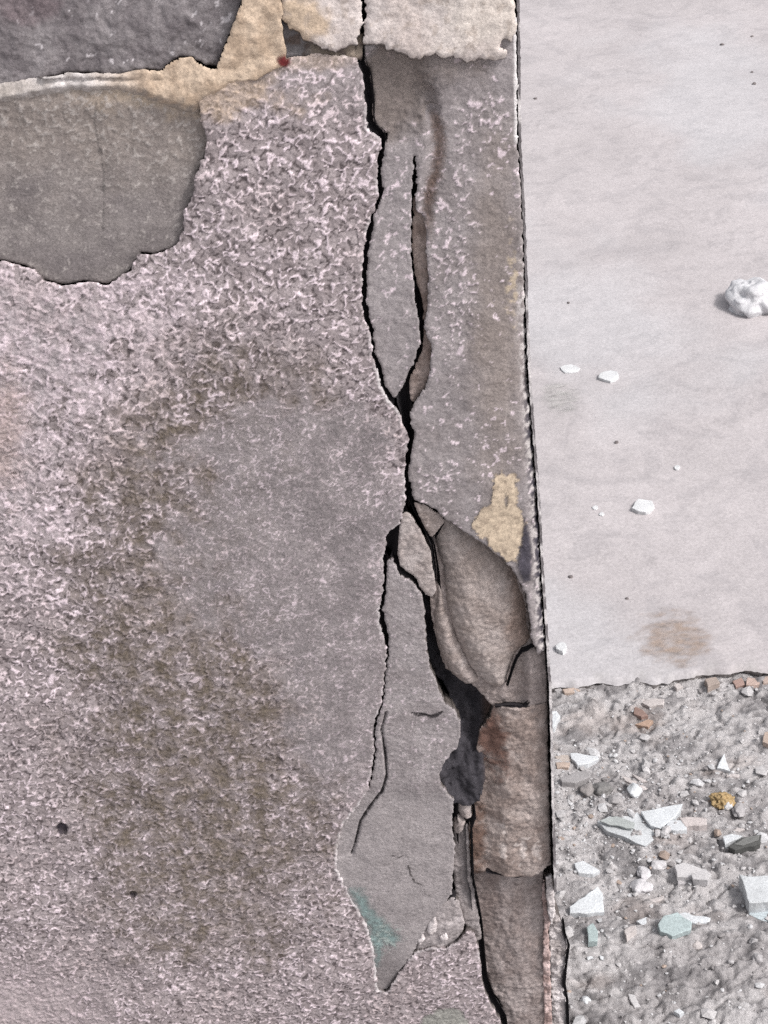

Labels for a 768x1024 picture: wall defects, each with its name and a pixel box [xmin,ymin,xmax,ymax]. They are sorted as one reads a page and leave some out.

spalling [0,89,207,284]
spalling [0,0,242,84]
spalling [282,21,429,137]
crack [351,0,445,853]
crack [495,238,554,882]
spalling [397,473,600,1024]
crack [447,803,523,1024]